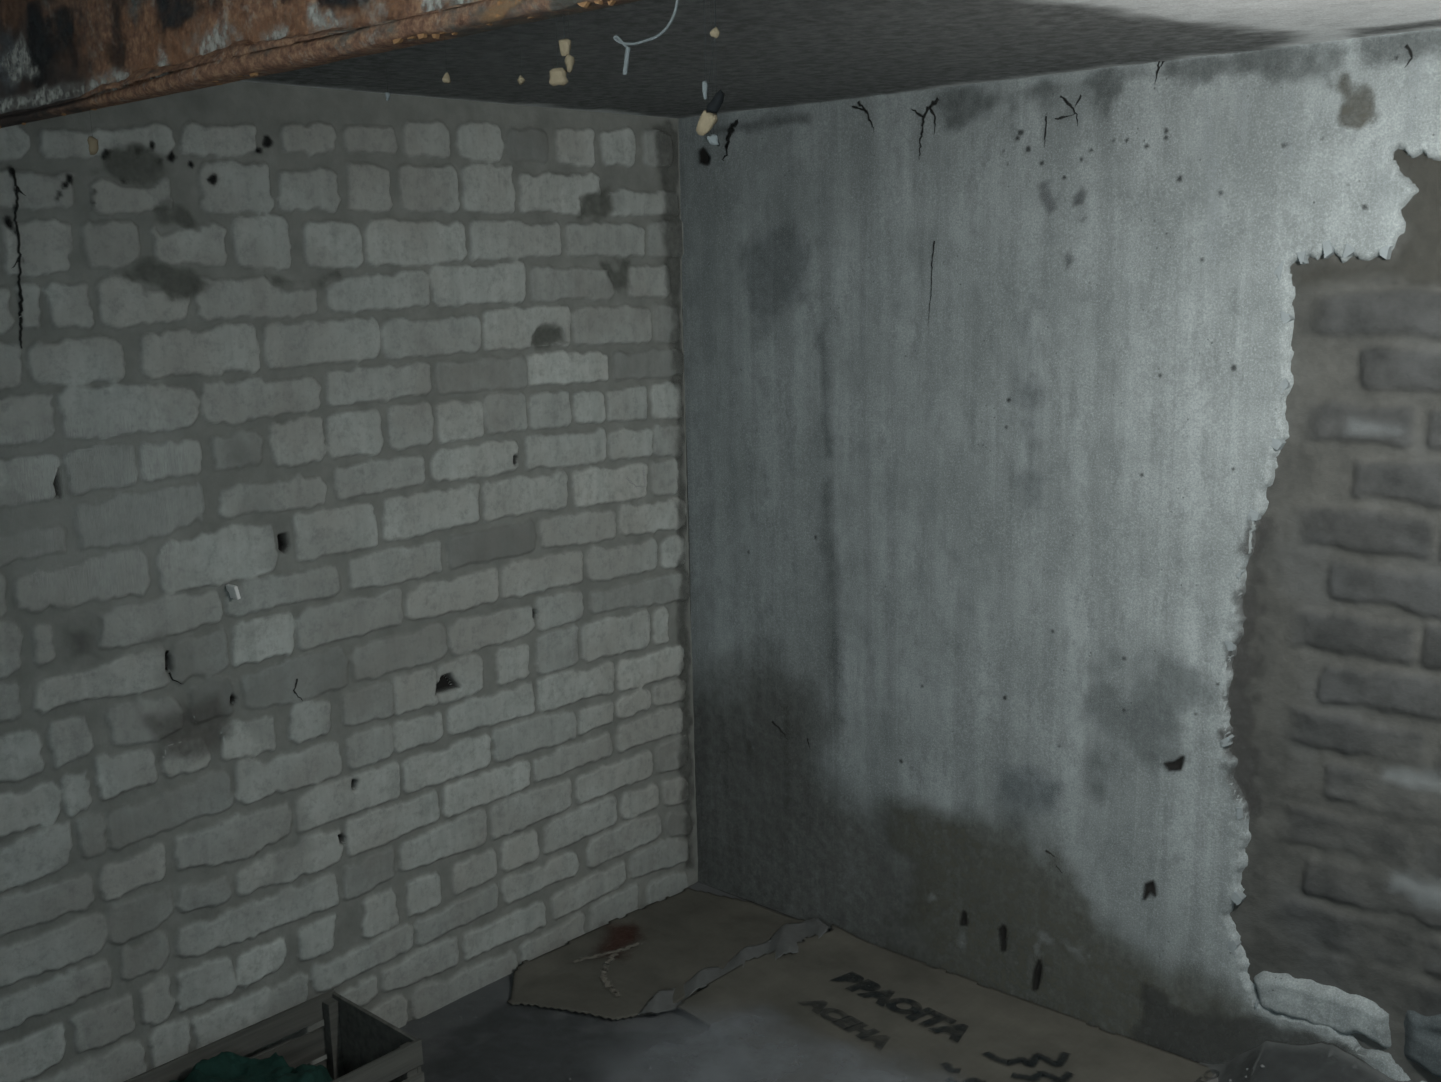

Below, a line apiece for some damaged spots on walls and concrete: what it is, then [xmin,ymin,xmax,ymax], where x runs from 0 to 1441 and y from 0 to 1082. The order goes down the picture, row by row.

corrosion [577,0,616,8]
crack [722,119,738,161]
crack [912,98,939,156]
crack [1044,95,1081,148]
crack [11,168,26,349]
water stain [657,128,683,389]
spalling [1217,149,1441,1082]
water stain [679,558,1362,1065]